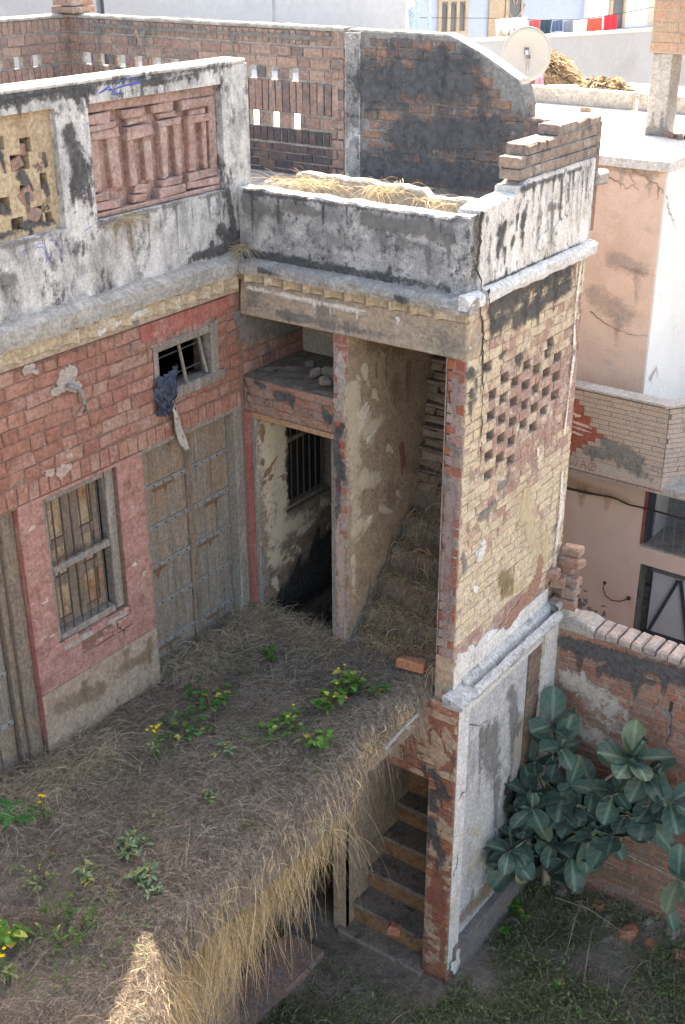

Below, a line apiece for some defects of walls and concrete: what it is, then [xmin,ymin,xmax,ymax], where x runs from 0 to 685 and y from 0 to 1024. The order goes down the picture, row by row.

leakage [352,42,516,194]
leakage [63,122,180,251]
leakage [484,166,589,287]
crack [609,168,676,228]
peeling [50,364,82,396]
peeling [256,420,331,599]
peeling [333,362,401,594]
crack [475,211,490,474]
peeling [570,399,604,455]
peeling [453,554,544,676]
peeling [413,722,455,770]
leakage [479,685,521,836]